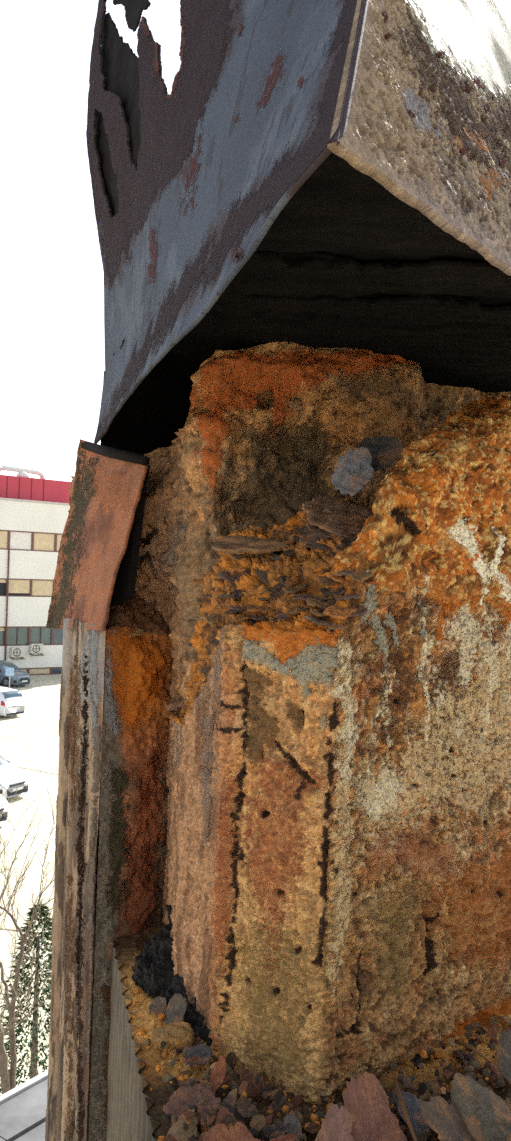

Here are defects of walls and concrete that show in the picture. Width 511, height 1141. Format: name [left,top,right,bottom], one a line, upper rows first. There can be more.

corrosion [381,0,511,200]
water stain [79,624,100,751]
corrosion [107,624,166,735]
water stain [242,518,511,996]